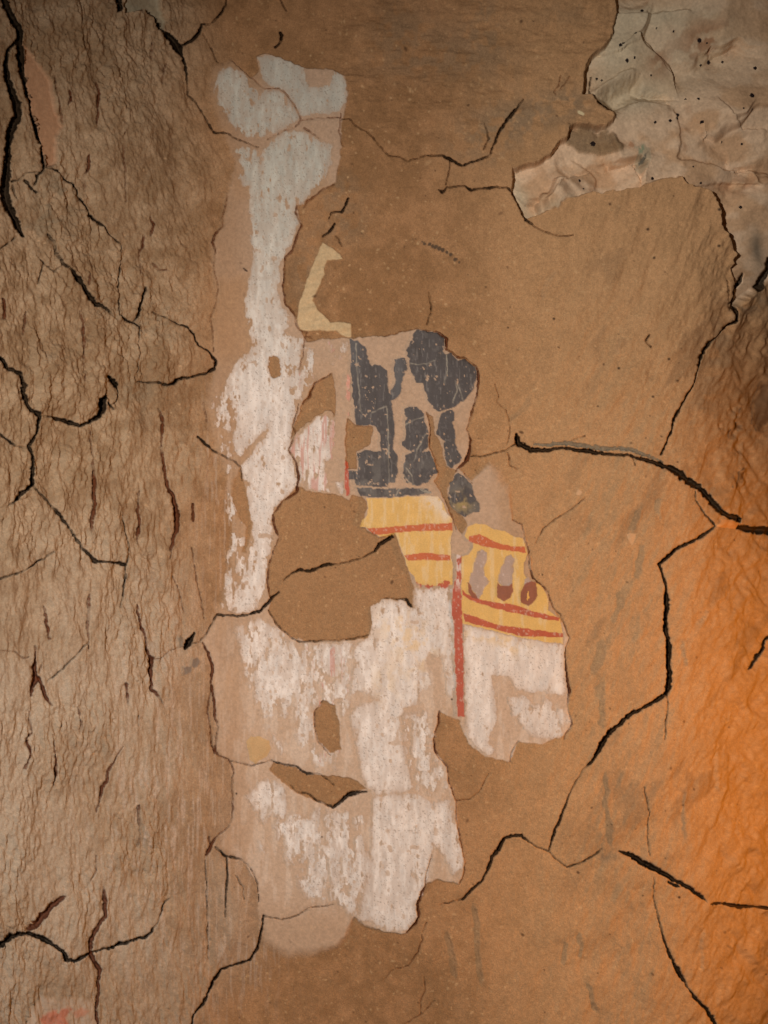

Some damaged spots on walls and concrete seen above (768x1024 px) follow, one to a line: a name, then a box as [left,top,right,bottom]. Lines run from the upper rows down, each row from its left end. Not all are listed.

crack [0,0,394,1024]
crack [116,0,573,237]
peeling [203,54,571,956]
crack [383,257,768,1024]